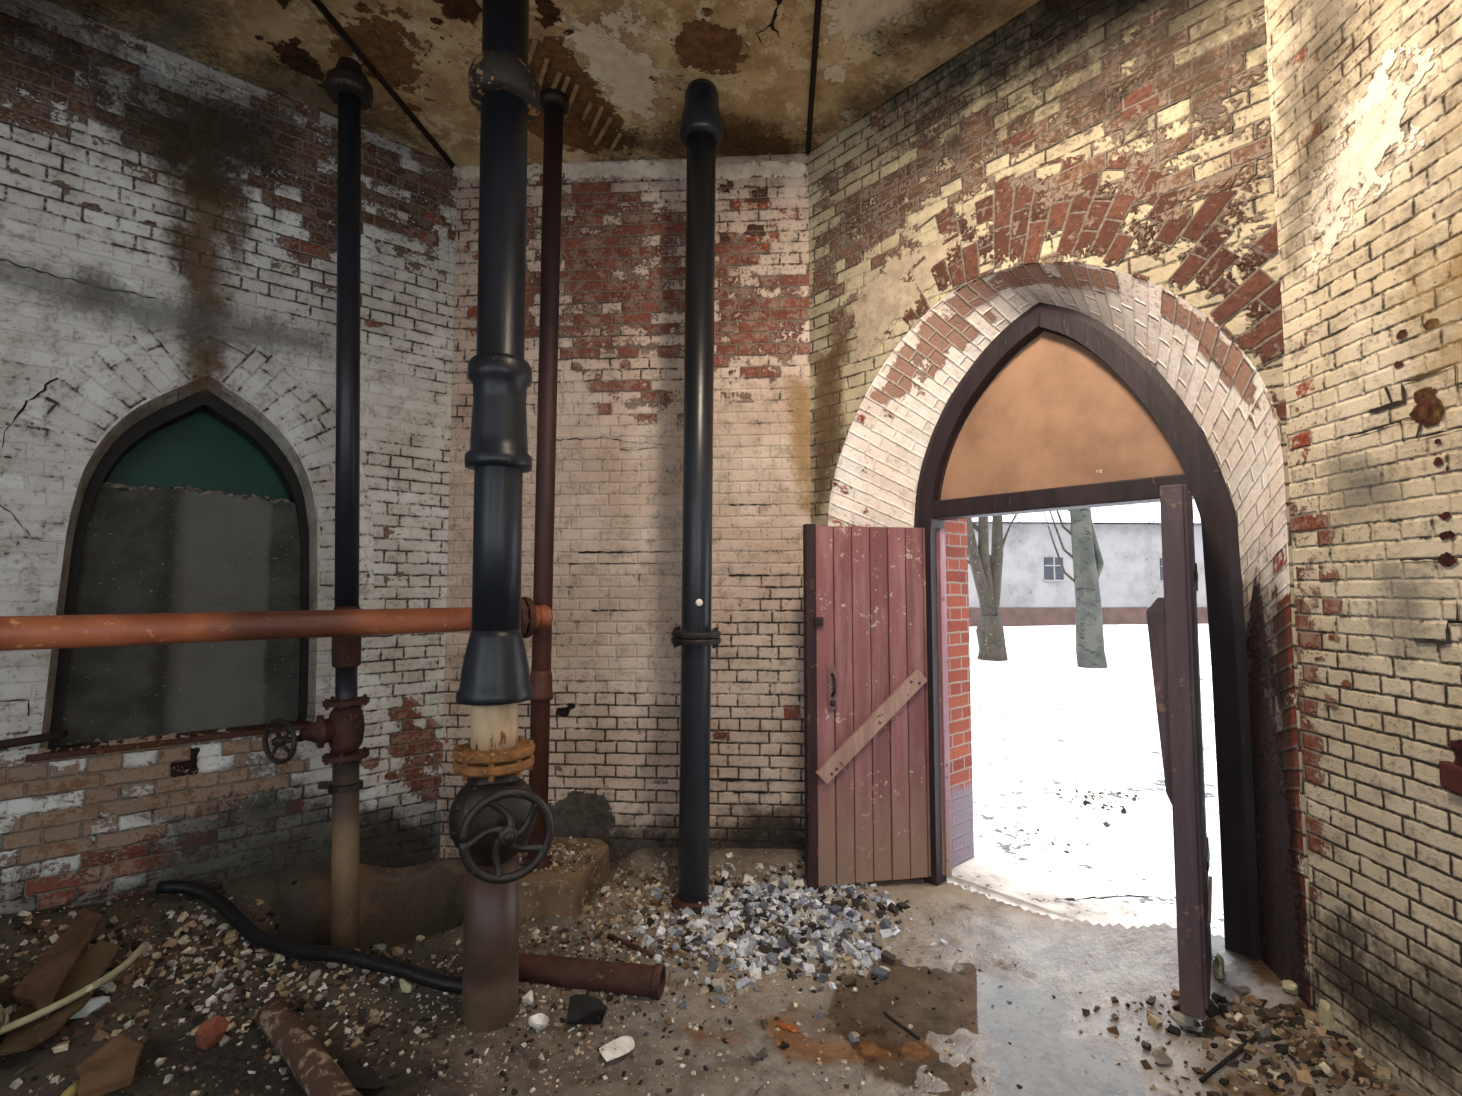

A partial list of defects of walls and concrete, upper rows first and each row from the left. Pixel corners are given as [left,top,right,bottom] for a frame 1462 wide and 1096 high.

crack [0,258,156,298]
peeling [0,10,338,294]
damp [101,64,278,388]
peeling [255,0,482,112]
peeling [361,132,480,276]
peeling [525,163,543,338]
peeling [528,0,751,425]
crack [756,0,783,47]
peeling [714,0,1287,441]
damp [1285,0,1352,220]
peeling [0,728,332,910]
flaking render [360,683,443,815]